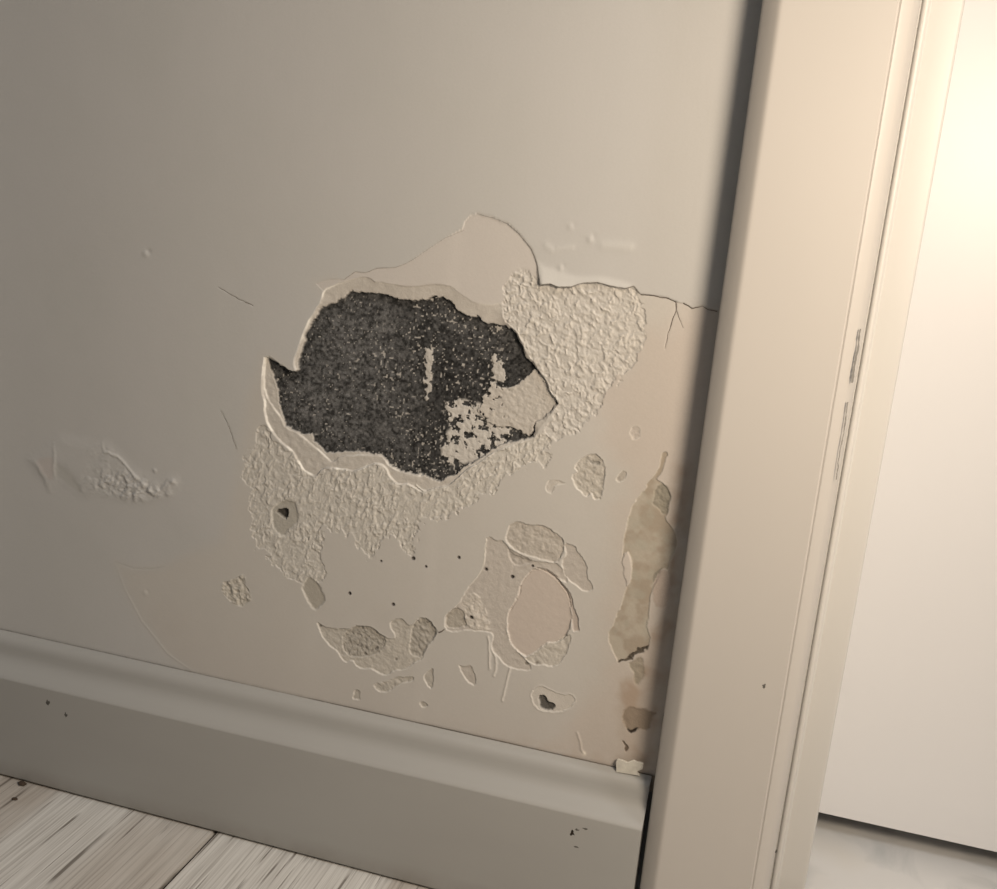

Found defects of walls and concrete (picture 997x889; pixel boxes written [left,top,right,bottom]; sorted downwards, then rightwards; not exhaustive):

crack [480,214,717,347]
spalling [263,277,558,491]
spalling [272,500,298,535]
spalling [303,577,325,609]
flaking render [318,521,593,692]
damp [529,297,721,792]
peeling [538,259,717,684]
spalling [532,686,575,712]